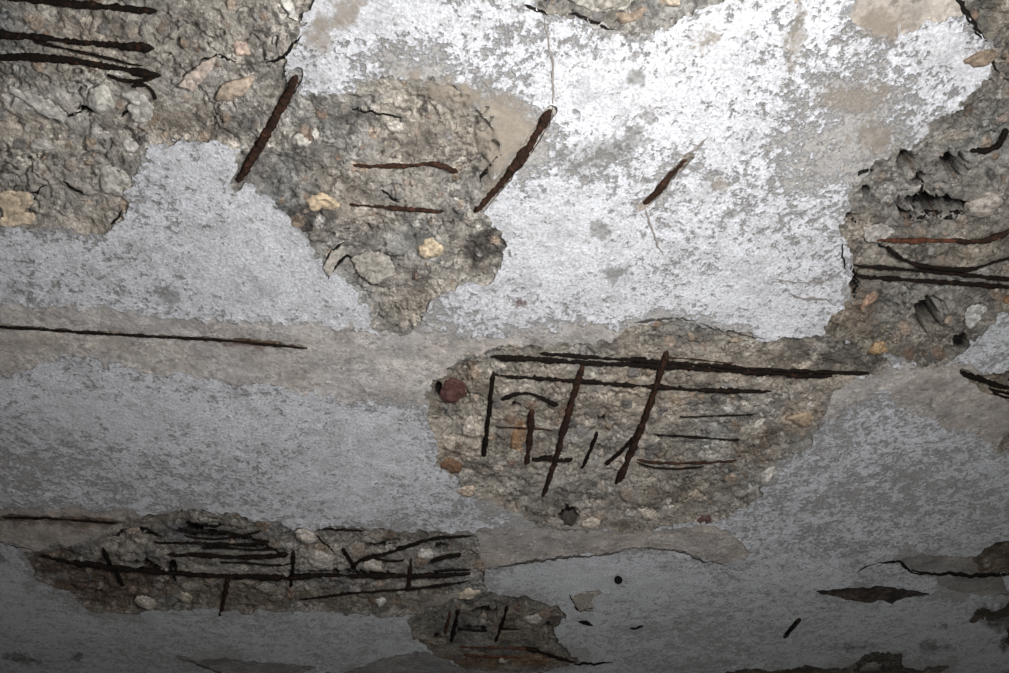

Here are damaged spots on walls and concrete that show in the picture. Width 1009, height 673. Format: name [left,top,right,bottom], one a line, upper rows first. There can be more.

spalling [0,0,1009,535]
crack [858,560,1009,579]
spalling [0,506,579,673]
peeling [571,590,602,613]
spalling [816,586,929,604]
peeling [902,541,1009,645]
spalling [726,651,949,673]